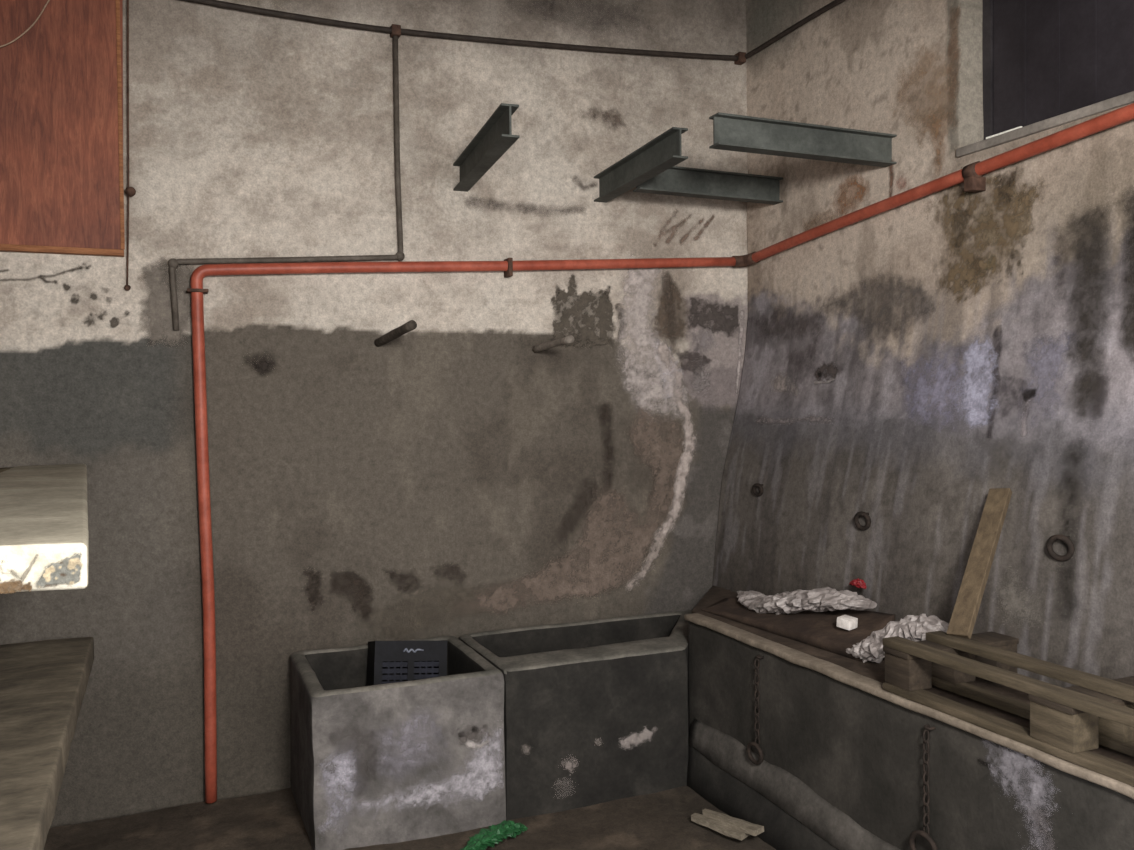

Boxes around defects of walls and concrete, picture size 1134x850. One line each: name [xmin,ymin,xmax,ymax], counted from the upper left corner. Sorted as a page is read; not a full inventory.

crack [0,267,82,283]
peeling [551,275,626,348]
peeling [677,351,712,374]
peeling [689,298,739,337]
leakage [904,328,1002,438]
leakage [1027,209,1107,416]
leakage [1121,195,1134,350]
spalling [0,553,82,594]
flaking render [372,408,684,639]
leakage [321,716,503,826]